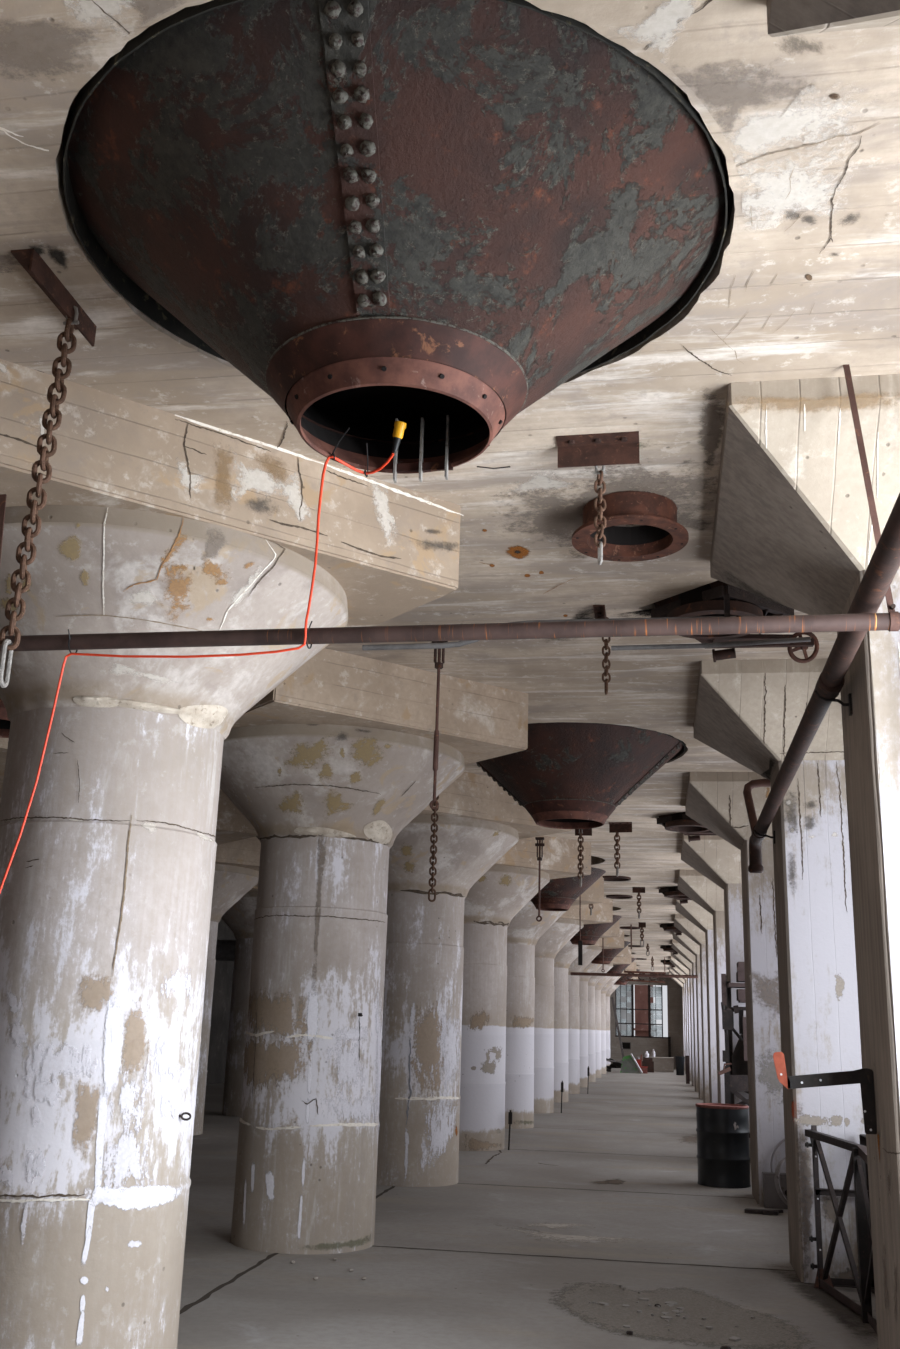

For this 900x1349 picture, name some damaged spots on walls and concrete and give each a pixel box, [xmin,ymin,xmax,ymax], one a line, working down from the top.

leakage [0,0,177,78]
leakage [618,0,694,52]
crack [736,123,881,254]
crack [123,419,367,597]
peeling [278,739,390,815]
peeling [79,976,114,1012]
peeling [0,990,183,1193]
peeling [244,989,313,1090]
peeling [471,1047,503,1074]
crack [0,1191,85,1199]
spalling [550,1282,814,1349]